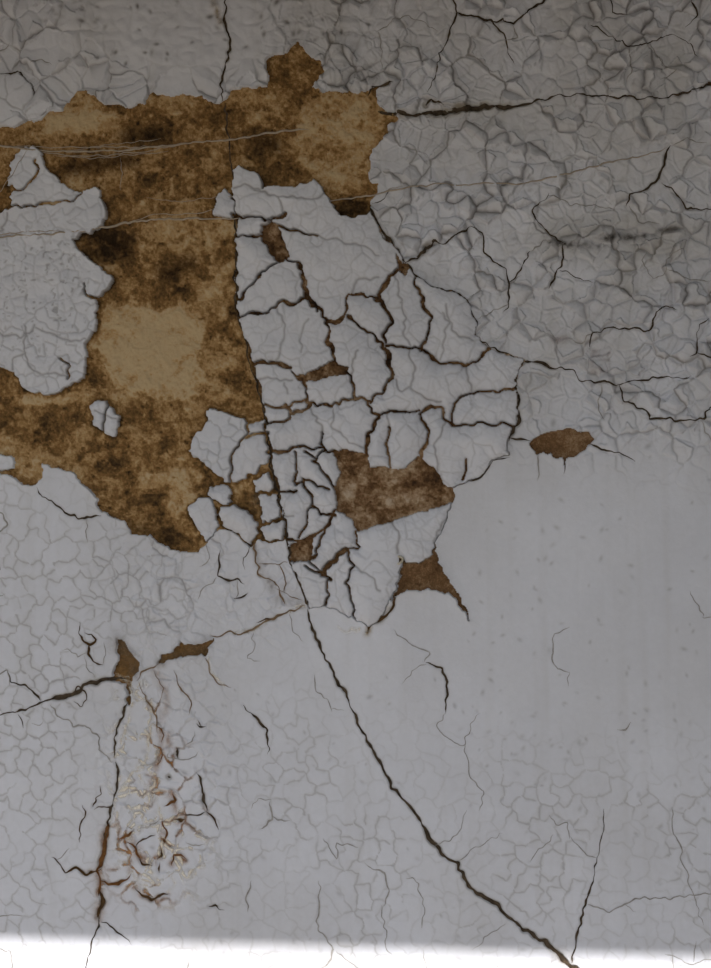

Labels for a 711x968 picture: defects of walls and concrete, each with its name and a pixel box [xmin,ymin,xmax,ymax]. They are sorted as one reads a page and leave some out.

peeling [0,42,525,627]
peeling [530,428,594,465]
crack [37,488,99,542]
crack [198,0,711,968]
peeling [114,639,140,705]
peeling [159,638,214,663]
crack [0,626,158,968]
crack [186,775,219,830]